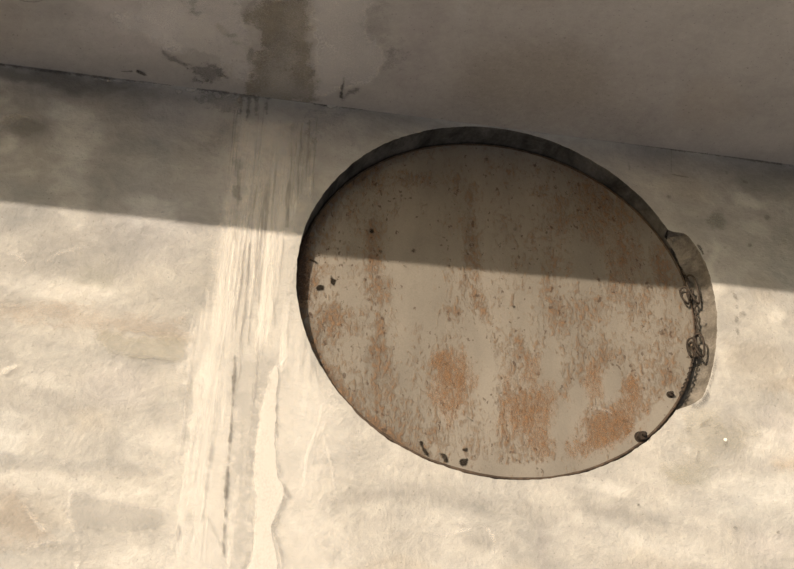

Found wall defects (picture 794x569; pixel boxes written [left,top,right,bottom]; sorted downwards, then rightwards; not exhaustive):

corrosion [296,232,312,304]
damp [249,367,284,569]